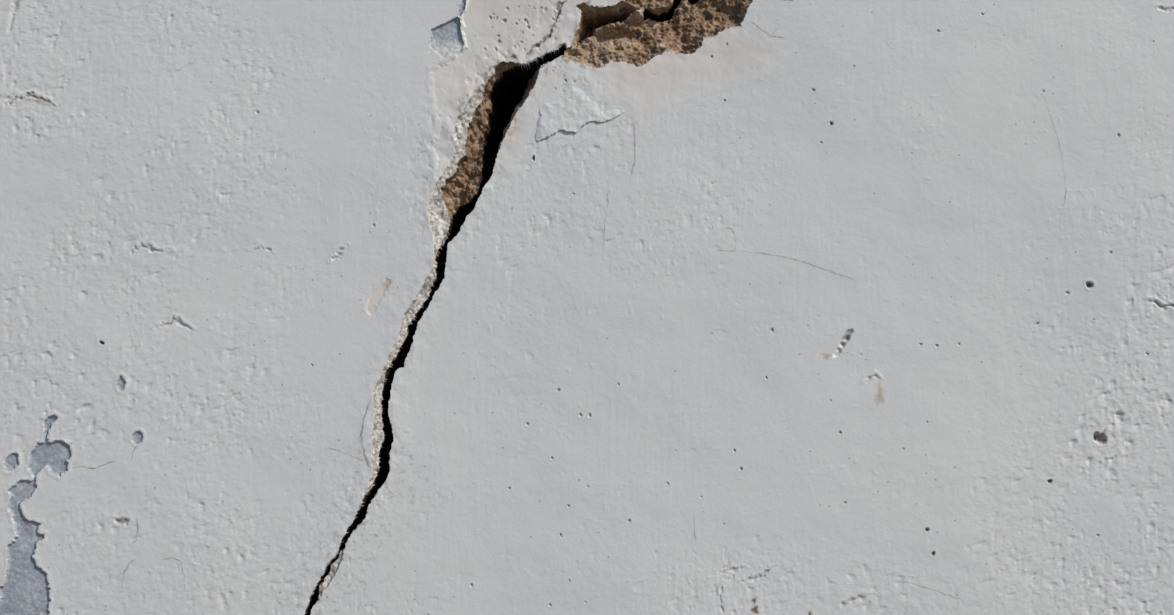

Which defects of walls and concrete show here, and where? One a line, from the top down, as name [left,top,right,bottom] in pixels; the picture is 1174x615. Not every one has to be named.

peeling [427,0,793,188]
crack [305,0,570,615]
peeling [0,414,72,615]